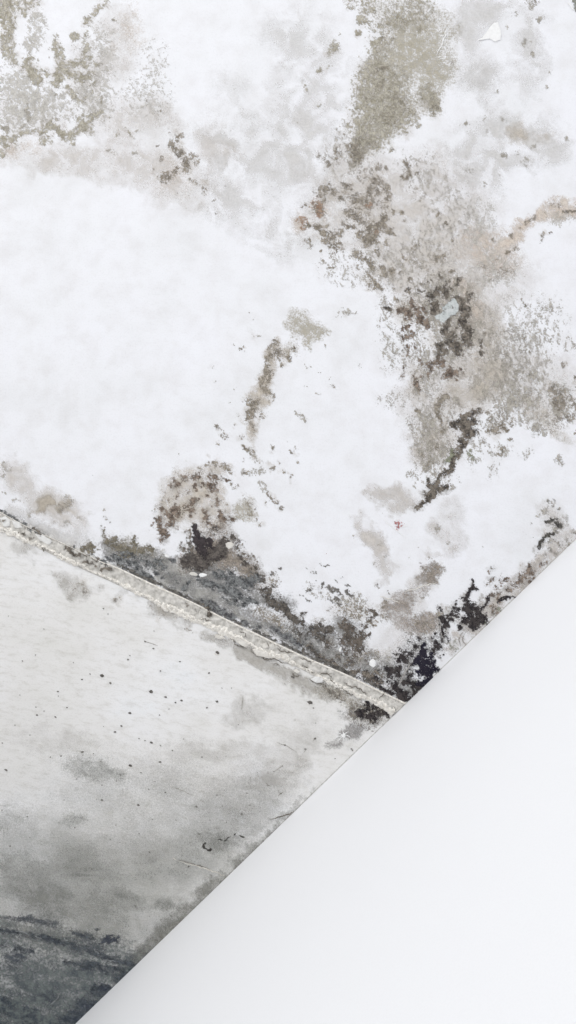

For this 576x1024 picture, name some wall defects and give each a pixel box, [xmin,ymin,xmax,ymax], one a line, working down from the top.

damp [0,0,576,511]
damp [0,311,576,751]
damp [0,839,258,993]